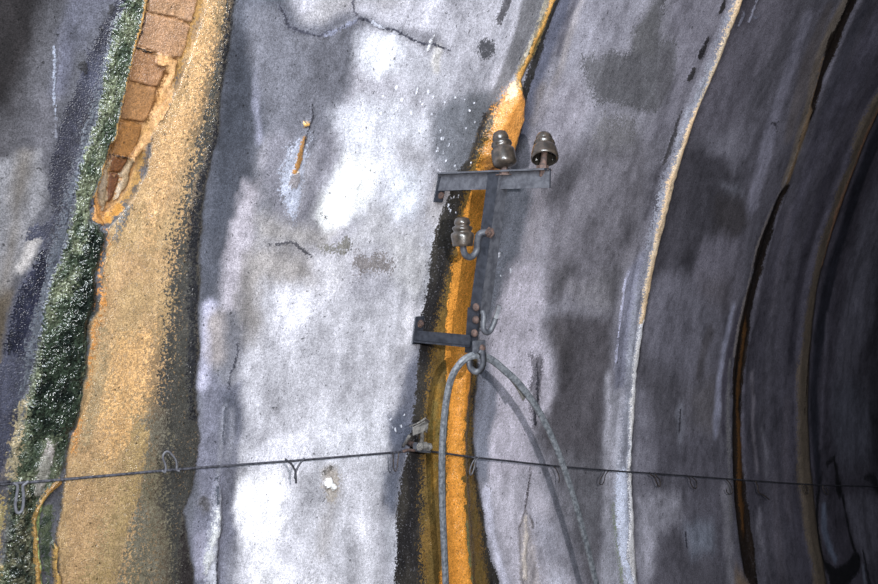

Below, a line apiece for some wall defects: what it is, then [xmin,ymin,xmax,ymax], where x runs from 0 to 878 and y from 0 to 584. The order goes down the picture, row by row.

leakage [0,0,117,480]
rust [54,0,238,584]
flaking render [91,0,207,227]
crack [276,0,451,53]
leakage [381,84,476,172]
rust [418,190,486,335]
leakage [576,0,762,584]
leakage [30,476,62,584]
rust [391,343,502,584]